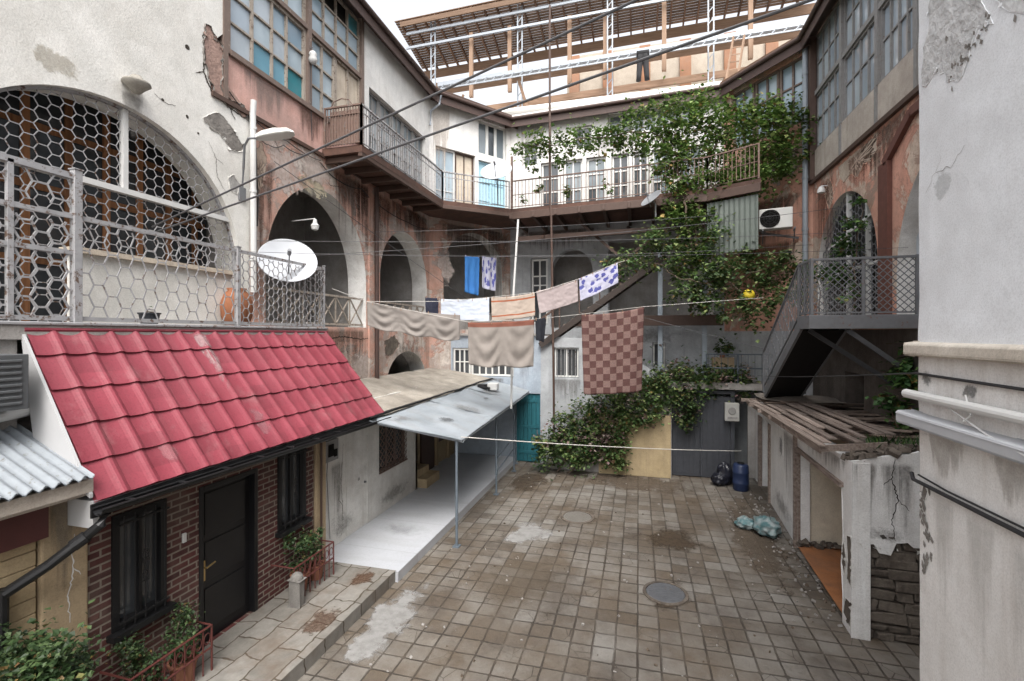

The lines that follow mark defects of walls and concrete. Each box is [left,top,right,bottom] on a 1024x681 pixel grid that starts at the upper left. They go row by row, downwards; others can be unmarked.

flaking render [202,24,257,152]
flaking render [921,0,1024,92]
crack [67,534,81,618]
leakage [650,530,702,552]
flaking render [841,486,933,644]
crack [884,461,909,541]